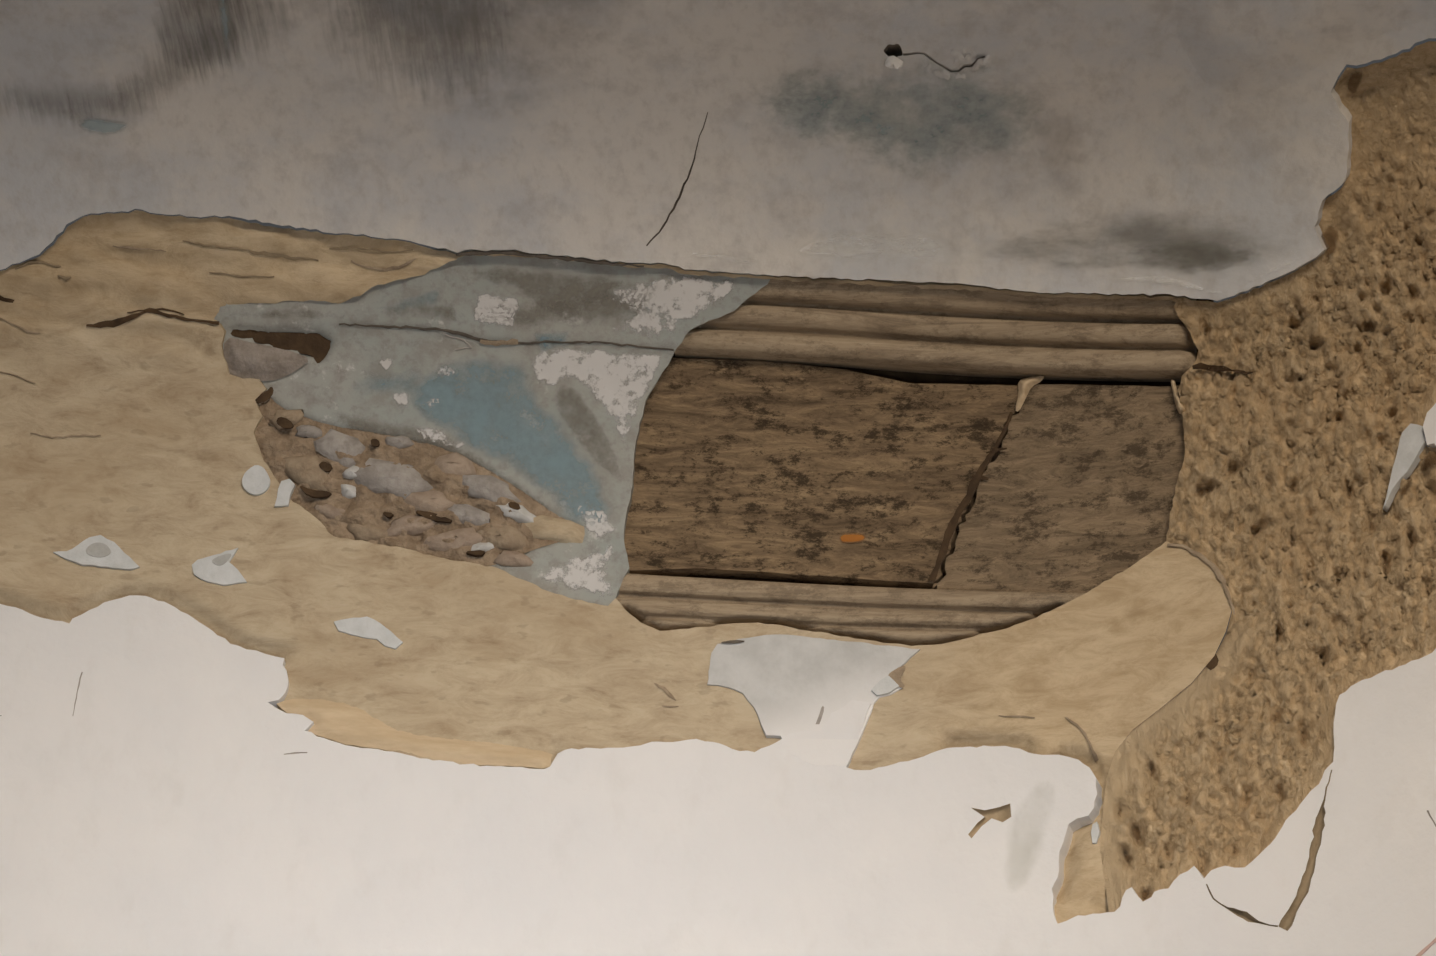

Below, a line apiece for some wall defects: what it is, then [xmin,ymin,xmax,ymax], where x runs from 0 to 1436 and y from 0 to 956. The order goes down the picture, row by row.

peeling [214,249,916,606]
crack [928,412,1013,582]
peeling [1383,424,1428,512]
peeling [53,535,140,570]
peeling [192,548,247,586]
peeling [334,617,403,650]
peeling [707,634,920,768]
peeling [1091,822,1100,844]